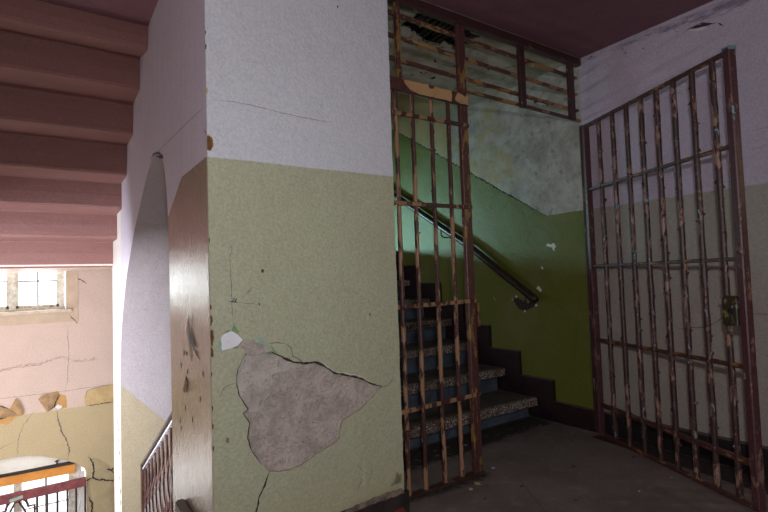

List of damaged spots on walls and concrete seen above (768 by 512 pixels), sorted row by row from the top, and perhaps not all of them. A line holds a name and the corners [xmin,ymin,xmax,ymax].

spalling [400,13,480,49]
peeling [0,398,24,425]
crack [0,317,103,456]
peeling [38,391,67,412]
peeling [84,385,118,406]
spalling [218,325,393,472]
crack [86,457,114,512]
crack [255,471,270,512]
peeling [345,488,405,512]